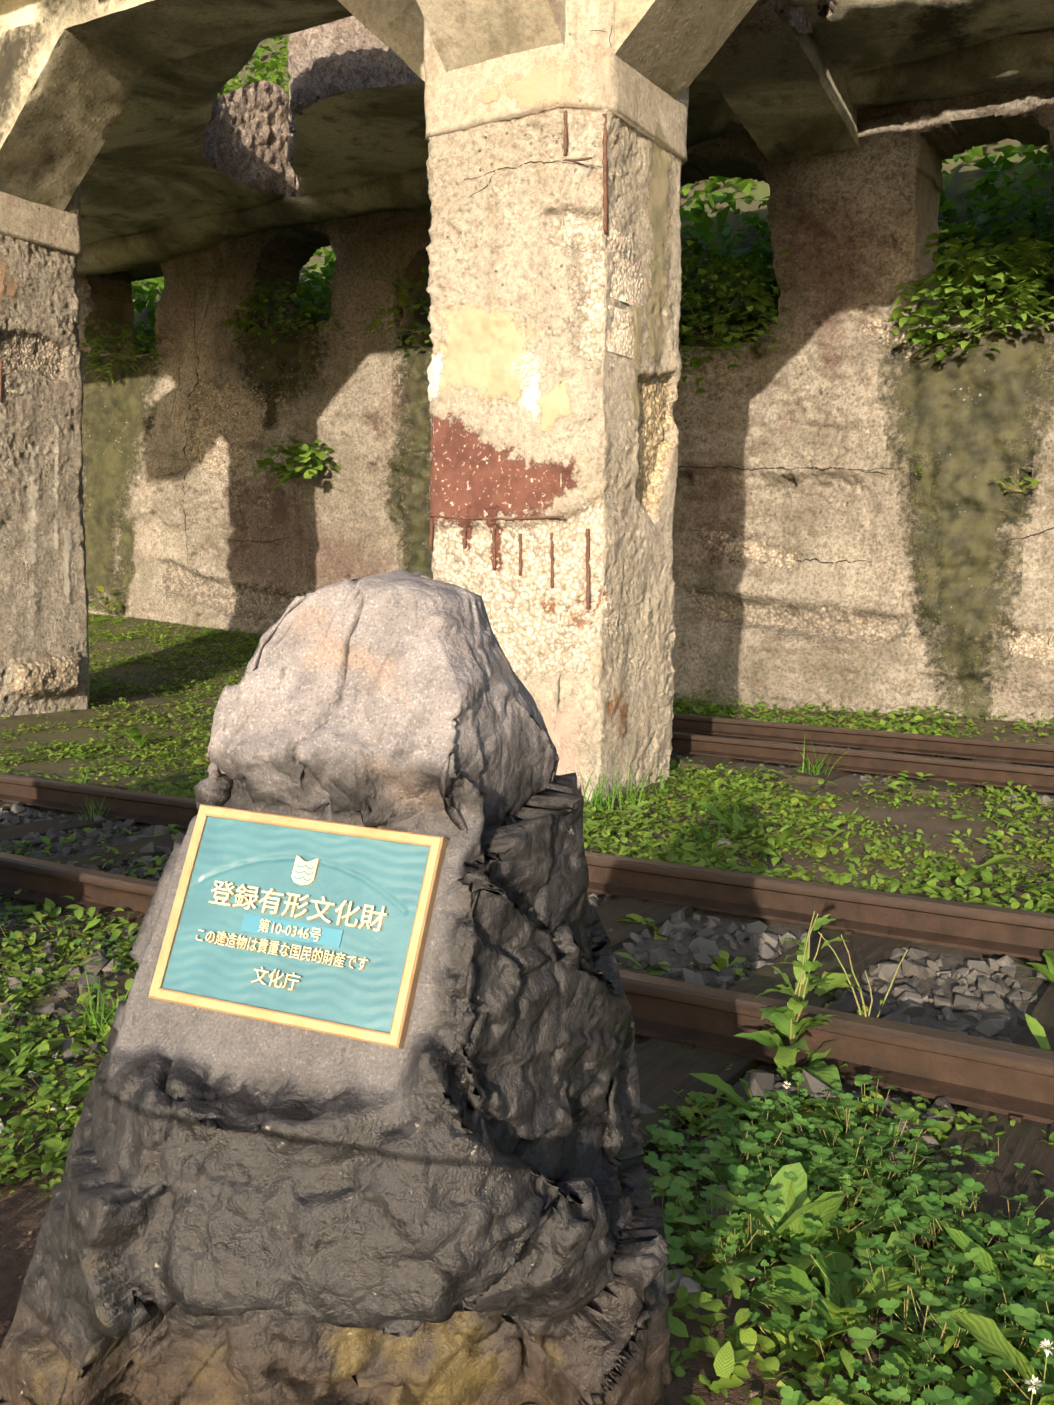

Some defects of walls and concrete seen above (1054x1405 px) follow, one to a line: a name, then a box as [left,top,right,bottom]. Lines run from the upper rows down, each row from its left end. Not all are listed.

water stain [0,0,67,138]
spalling [481,56,678,523]
peeling [427,351,444,402]
corrosion [436,303,572,431]
spalling [158,559,306,622]
corrosion [429,412,580,572]
spalling [428,492,621,680]
corrosion [542,589,616,627]
water stain [877,322,1054,719]
peeling [533,695,582,775]